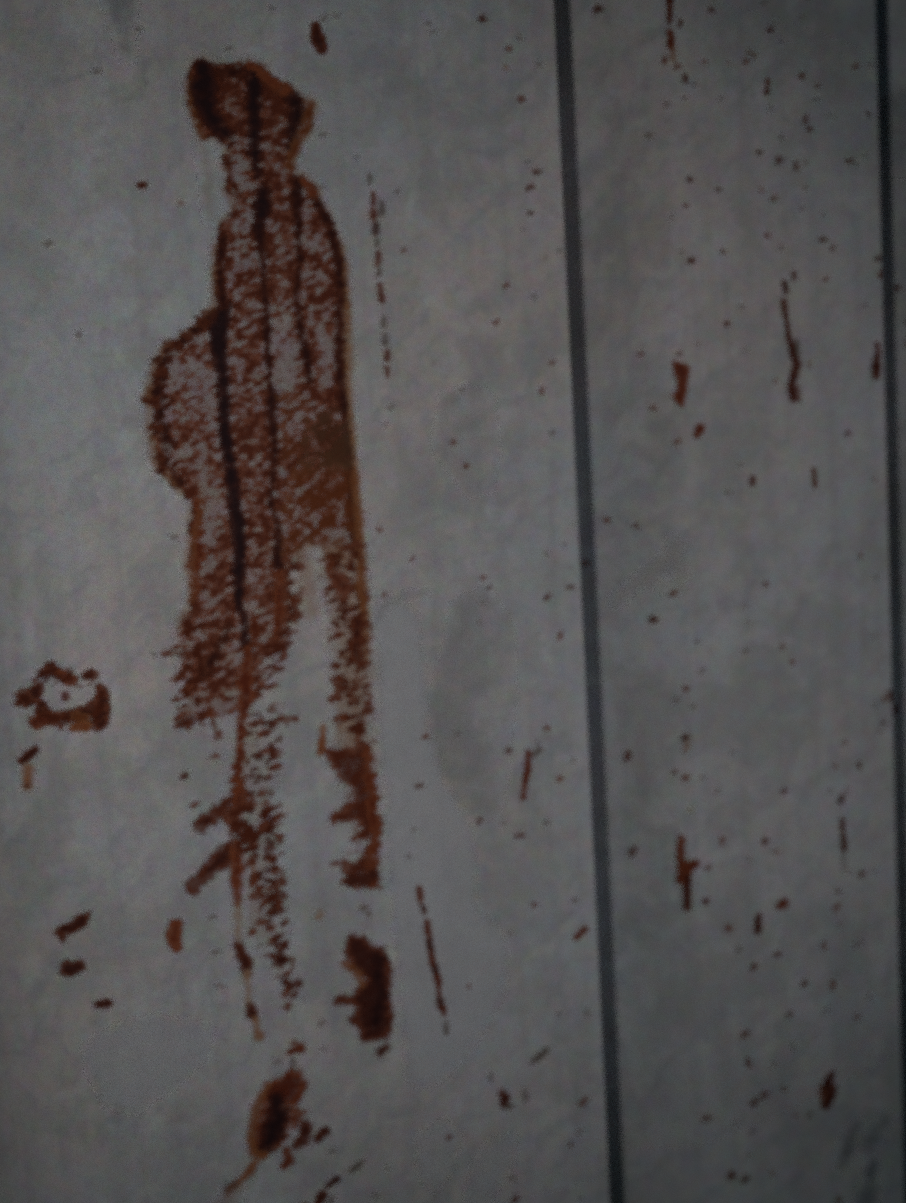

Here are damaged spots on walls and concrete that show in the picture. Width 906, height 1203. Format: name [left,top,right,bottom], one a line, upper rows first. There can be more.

rust [662,0,688,83]
rust [774,272,802,402]
rust [673,352,690,407]
rust [142,60,385,1040]
rust [15,661,111,732]
rust [17,746,39,789]
rust [676,835,711,911]
rust [333,934,395,1057]
rust [416,886,448,1034]
rust [225,1040,333,1195]
rust [314,1160,364,1203]